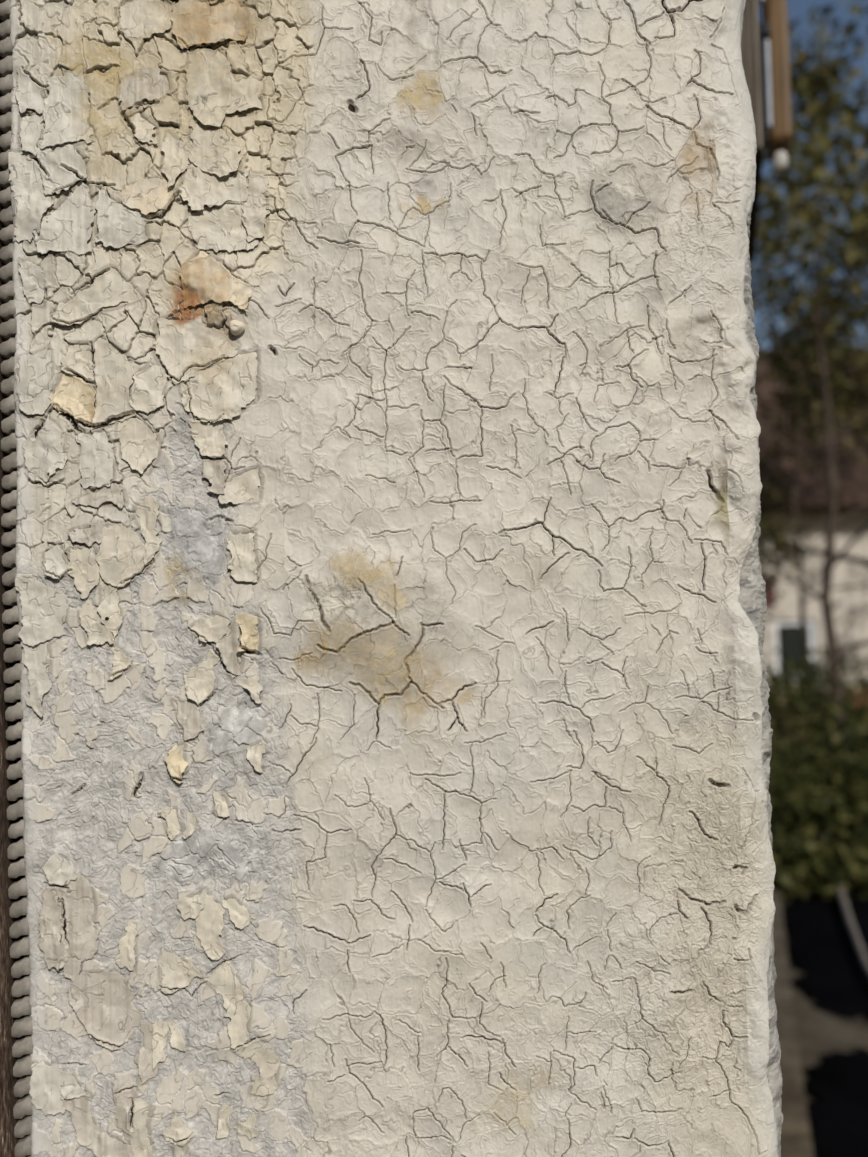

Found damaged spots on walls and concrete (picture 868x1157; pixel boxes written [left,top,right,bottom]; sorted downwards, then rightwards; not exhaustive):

crack [123,103,159,134]
crack [32,158,114,194]
crack [148,195,178,220]
rust [176,270,205,319]
crack [57,271,108,384]
crack [129,349,222,422]
crack [34,407,132,438]
spalling [8,0,308,1157]
crack [193,0,749,1157]
crack [46,883,68,942]
crack [67,1035,122,1065]
crack [117,1086,135,1127]